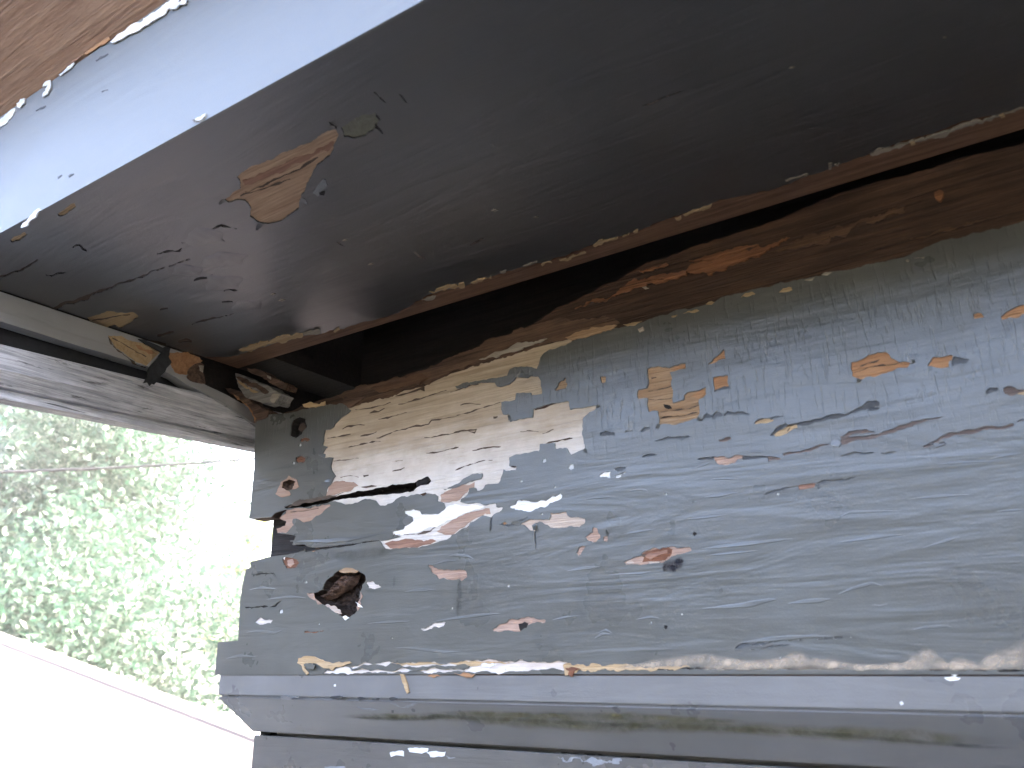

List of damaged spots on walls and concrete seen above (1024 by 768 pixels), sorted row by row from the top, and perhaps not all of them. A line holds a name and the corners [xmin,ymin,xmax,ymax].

peeling [42,0,187,97]
peeling [0,98,25,128]
peeling [219,125,338,230]
peeling [88,311,206,384]
peeling [637,364,730,428]
peeling [851,352,915,382]
peeling [277,338,609,556]
crack [600,401,1023,495]
crack [286,477,431,509]
peeling [625,547,691,565]
peeling [493,617,546,632]
peeling [297,656,690,699]